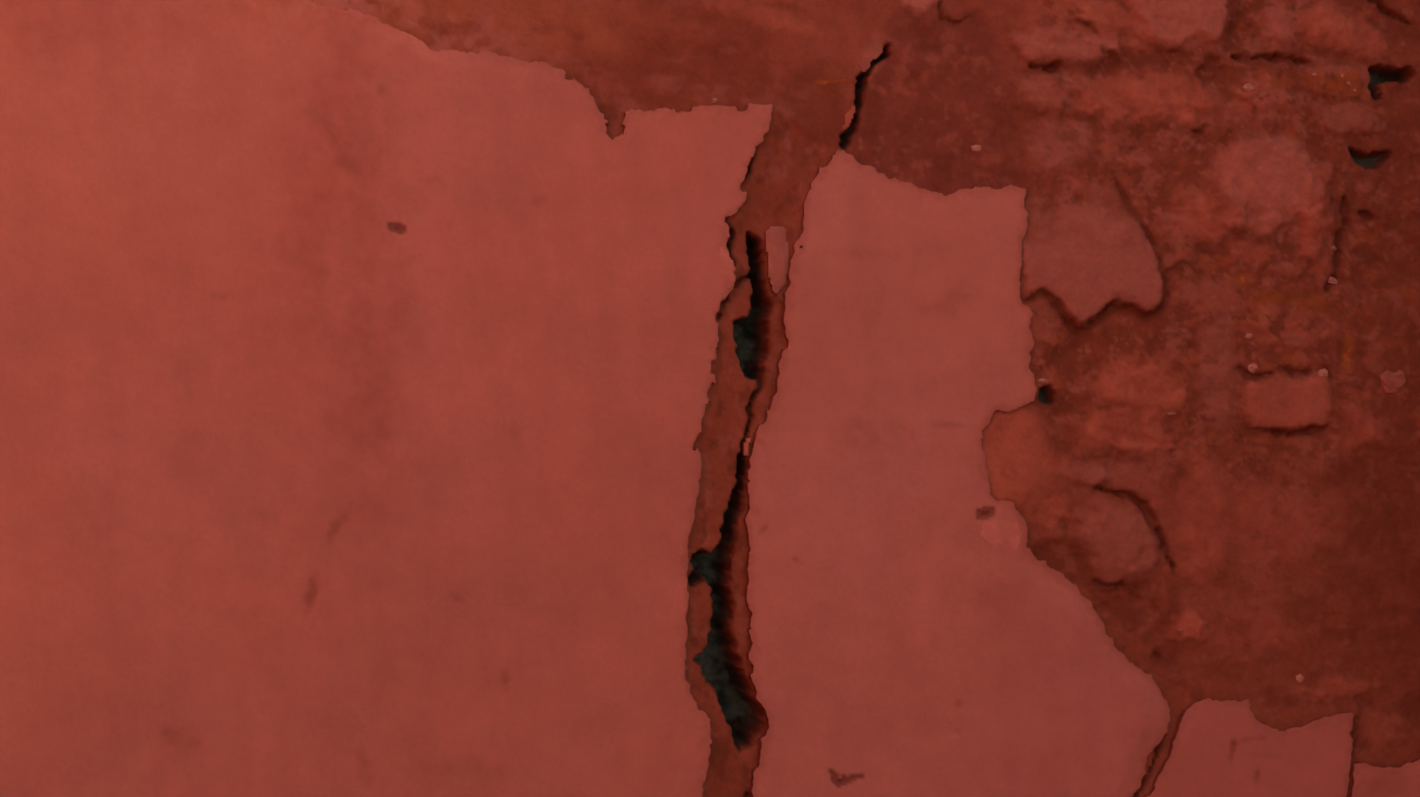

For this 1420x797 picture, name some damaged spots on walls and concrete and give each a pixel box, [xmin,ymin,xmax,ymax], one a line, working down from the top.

crack [685,40,885,797]
spalling [311,0,1420,768]
crack [1133,713,1181,797]
crack [1346,718,1366,797]